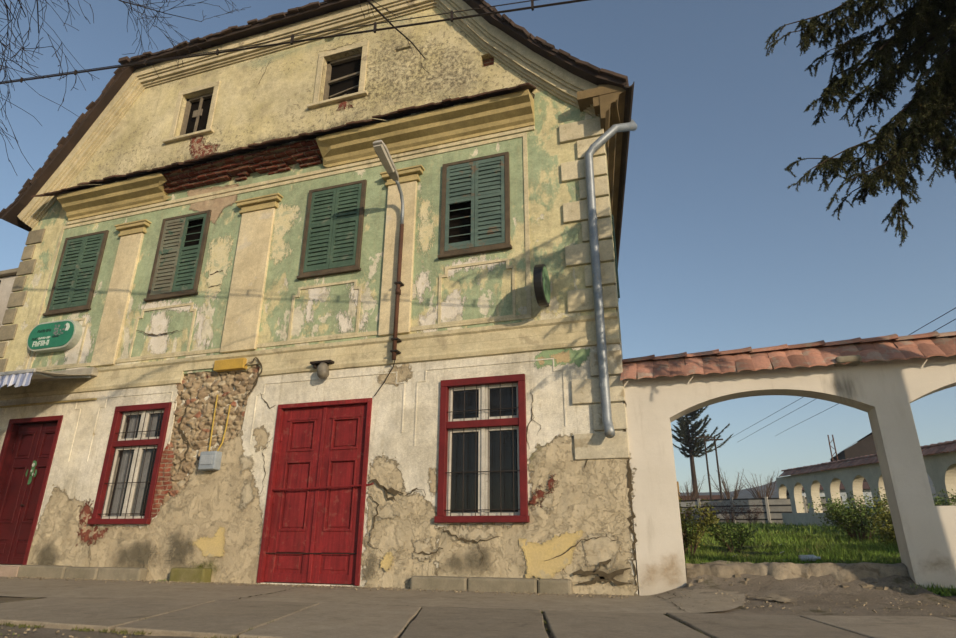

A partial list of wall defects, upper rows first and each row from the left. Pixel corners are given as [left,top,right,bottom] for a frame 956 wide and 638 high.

peeling [138,232,234,355]
peeling [303,282,334,323]
peeling [335,279,369,339]
peeling [412,197,511,333]
peeling [26,425,270,584]
crack [368,479,426,551]
crack [413,527,500,565]
peeling [360,433,639,596]
crack [545,458,637,586]